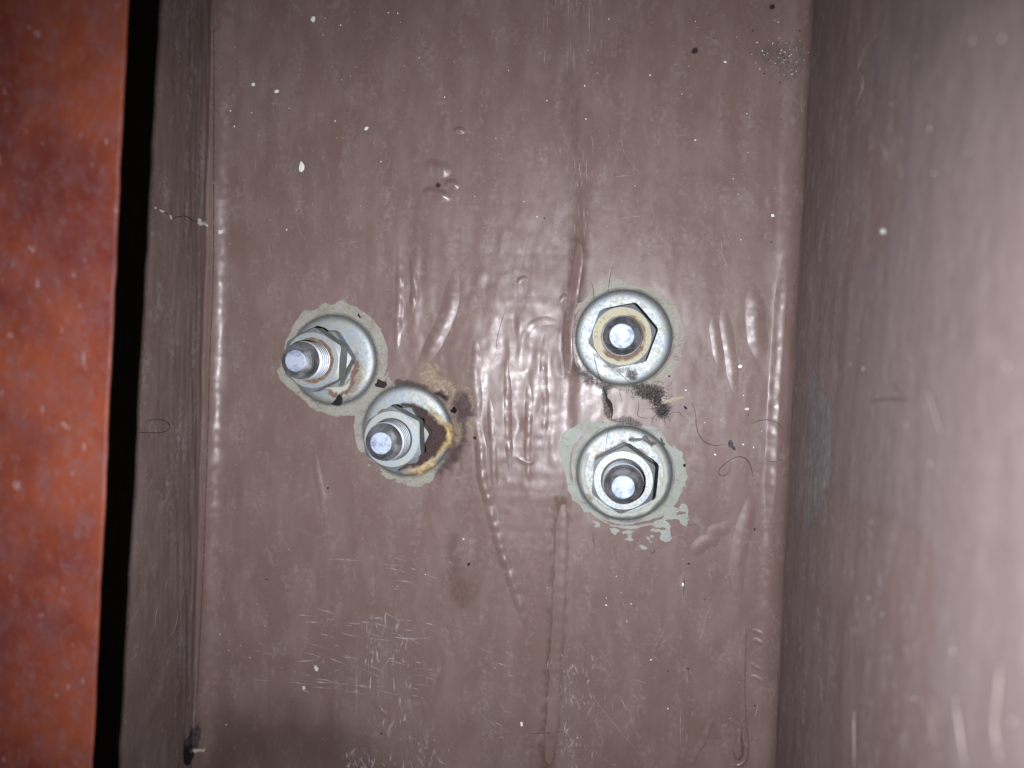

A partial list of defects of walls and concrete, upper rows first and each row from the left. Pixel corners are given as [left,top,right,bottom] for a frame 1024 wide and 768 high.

rust [302,337,361,397]
peeling [277,300,446,487]
rust [395,362,474,474]
peeling [559,420,689,550]